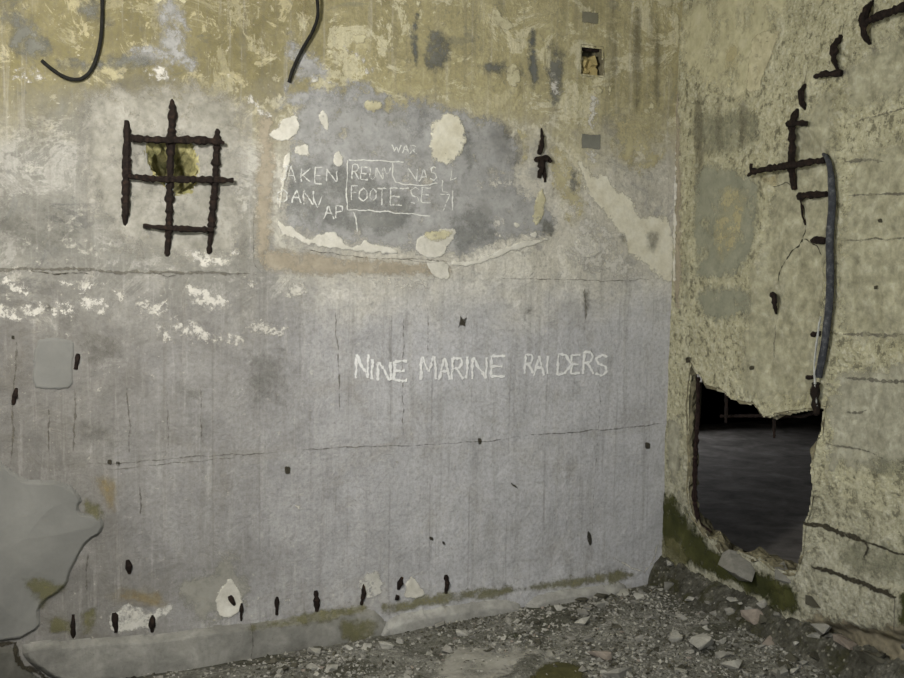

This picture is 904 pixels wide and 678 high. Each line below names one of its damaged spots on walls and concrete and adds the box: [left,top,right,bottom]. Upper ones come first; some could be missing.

flaking render [653,0,787,101]
spalling [80,66,245,270]
peeling [248,96,309,208]
peeling [319,110,329,130]
peeling [278,220,397,254]
peeling [333,151,343,166]
flaking render [429,113,467,165]
peeling [372,128,553,289]
flaking render [568,94,681,309]
spalling [685,0,904,576]
crack [803,521,904,558]
crack [811,566,897,629]